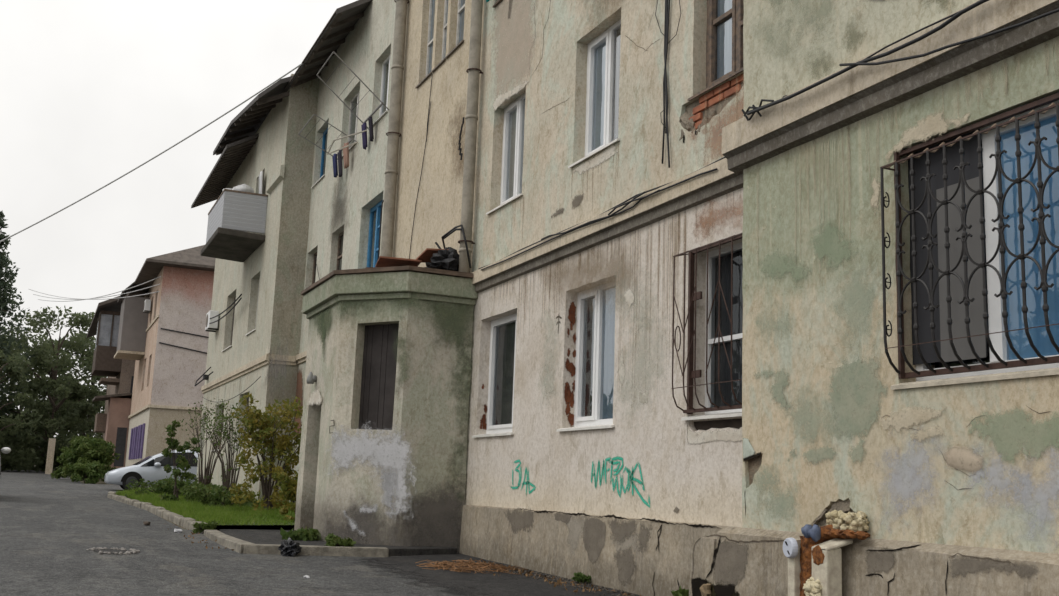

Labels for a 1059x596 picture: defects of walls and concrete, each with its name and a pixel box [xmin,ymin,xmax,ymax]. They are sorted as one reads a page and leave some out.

spalling [679,73,744,156]
spalling [686,418,762,512]
spalling [691,540,748,596]